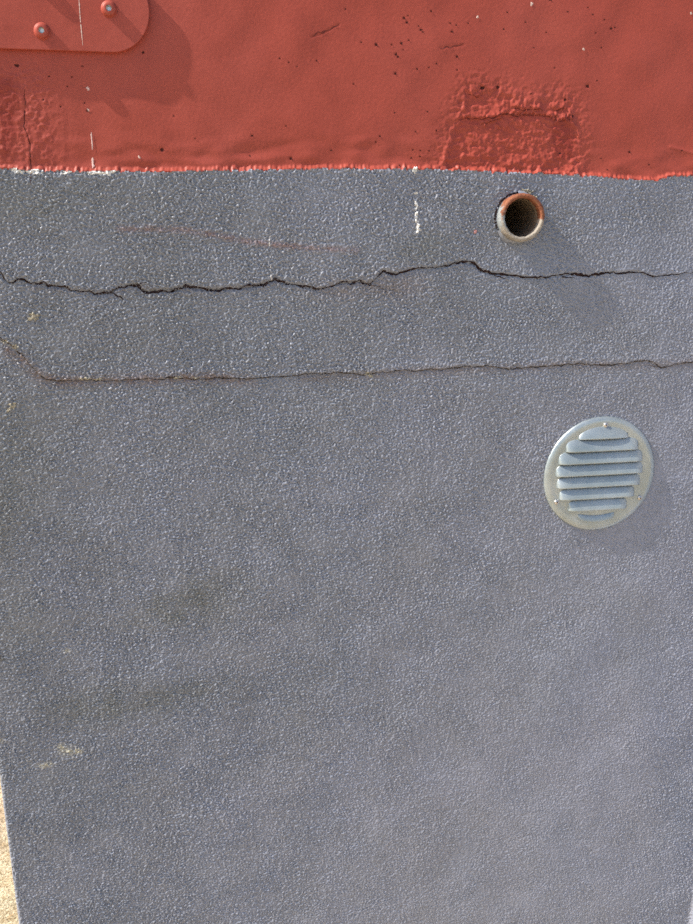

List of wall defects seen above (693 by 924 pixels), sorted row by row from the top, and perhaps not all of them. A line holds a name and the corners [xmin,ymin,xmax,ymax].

crack [0,260,693,300]
crack [0,334,693,395]